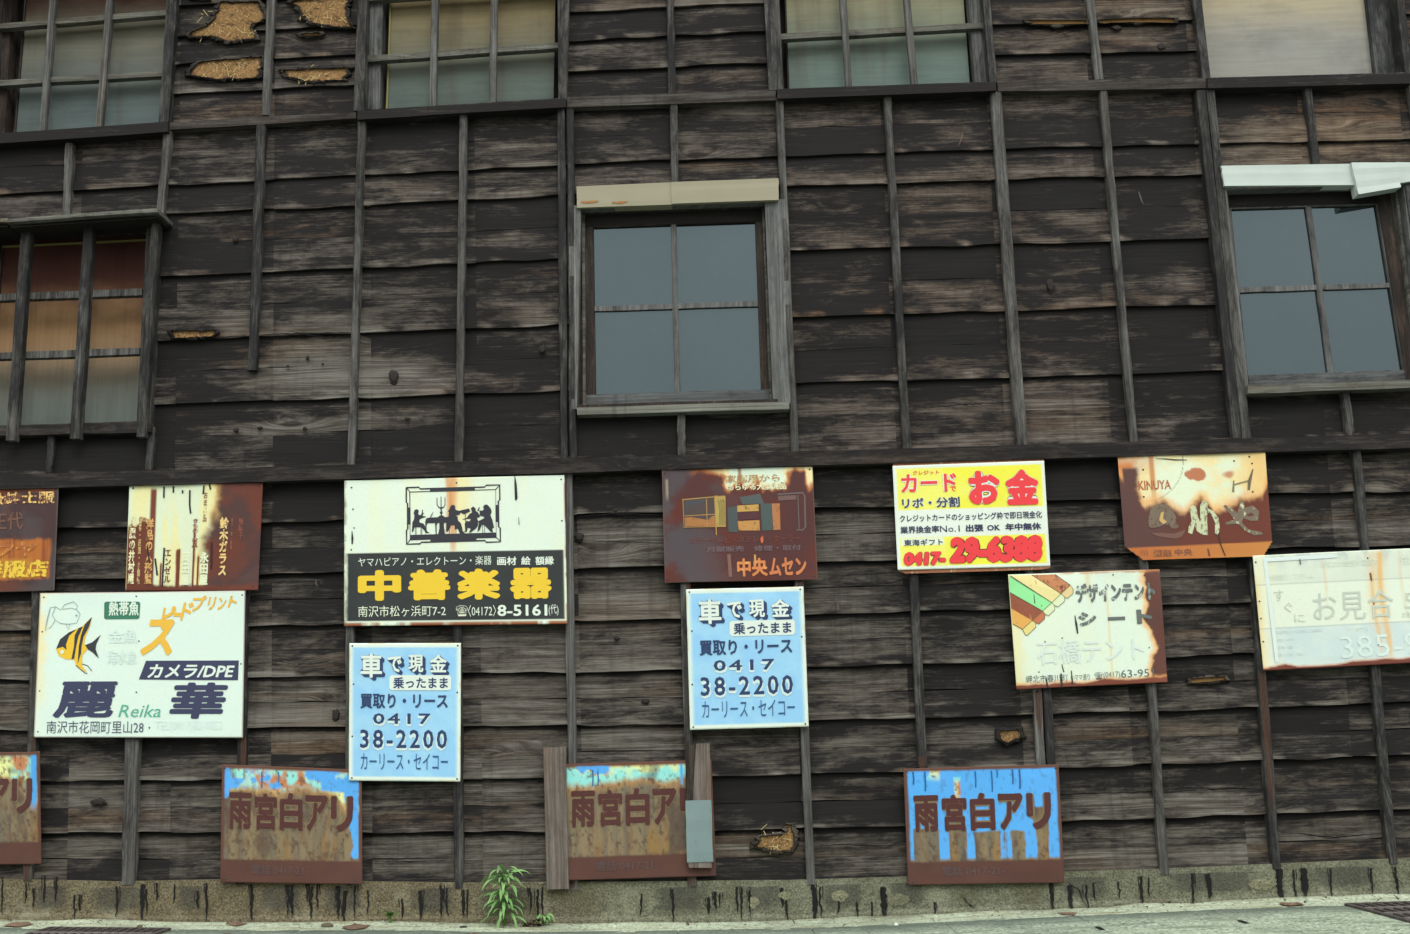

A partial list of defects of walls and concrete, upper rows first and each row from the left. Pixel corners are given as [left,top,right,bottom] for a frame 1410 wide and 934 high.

water stain [25,875,83,920]
water stain [140,883,176,920]
water stain [194,883,208,921]
water stain [285,884,370,921]
water stain [398,885,469,919]
water stain [527,887,544,915]
water stain [705,887,751,919]
water stain [811,884,888,919]
water stain [1049,883,1095,910]
water stain [1138,876,1150,902]
water stain [1191,872,1212,903]
water stain [1276,868,1309,898]